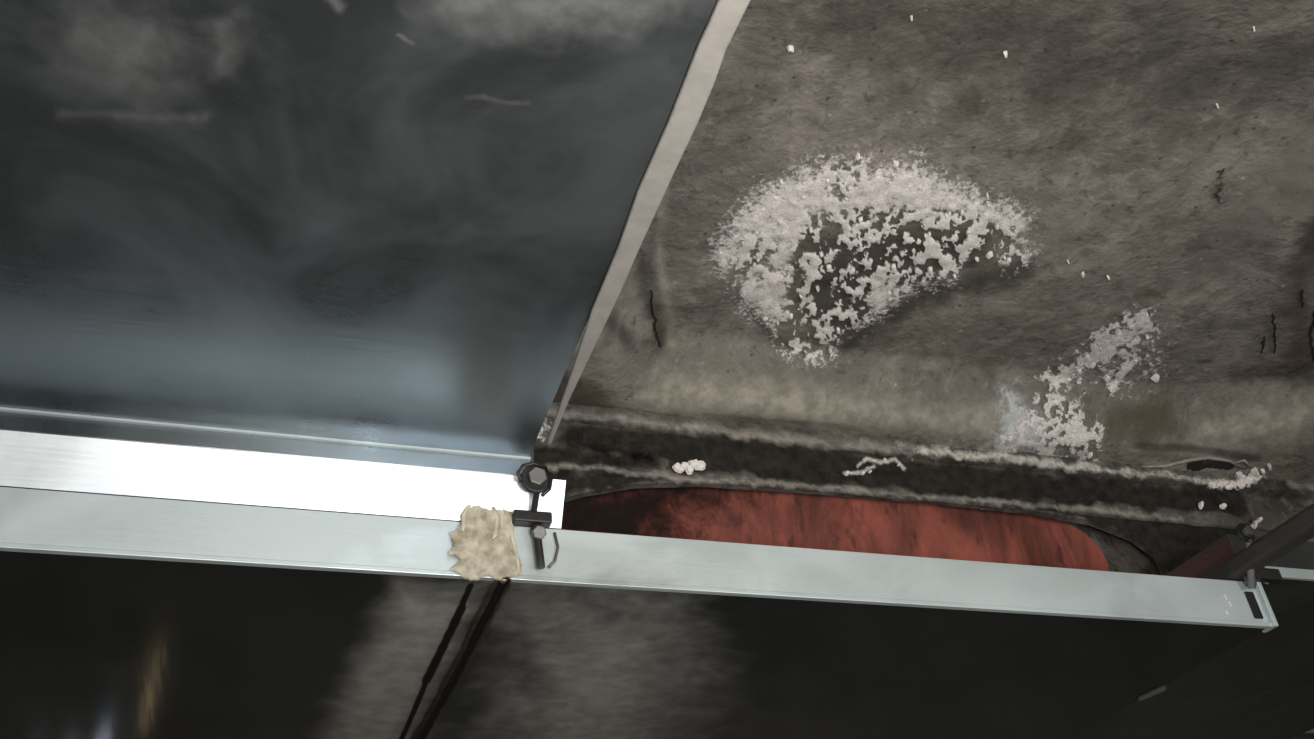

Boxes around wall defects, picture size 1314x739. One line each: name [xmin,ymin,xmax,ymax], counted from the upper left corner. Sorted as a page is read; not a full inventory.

damp [708,149,1038,368]
crack [650,290,662,347]
crack [1260,289,1314,362]
damp [534,301,1272,572]
damp [1166,392,1314,450]